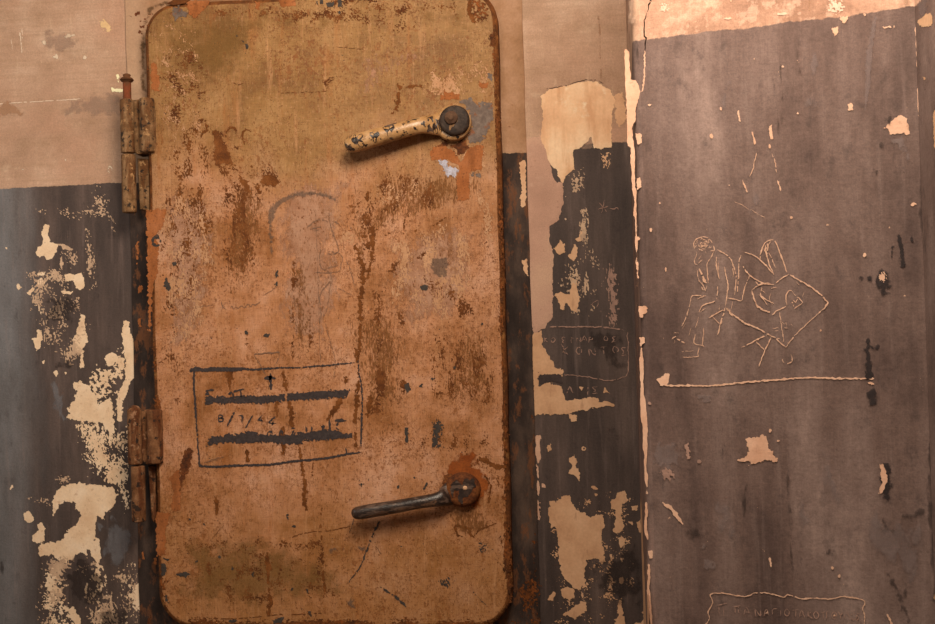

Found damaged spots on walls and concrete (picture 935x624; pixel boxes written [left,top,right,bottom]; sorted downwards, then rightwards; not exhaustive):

rust [169,0,489,43]
crack [641,0,651,92]
peeling [917,13,932,27]
rust [135,44,281,333]
peeling [16,180,190,624]
rust [343,145,484,448]
rust [408,30,541,624]
peeling [635,306,648,393]
peeling [656,373,670,386]
peeling [737,429,780,466]
rust [155,448,193,557]
rust [188,508,418,624]